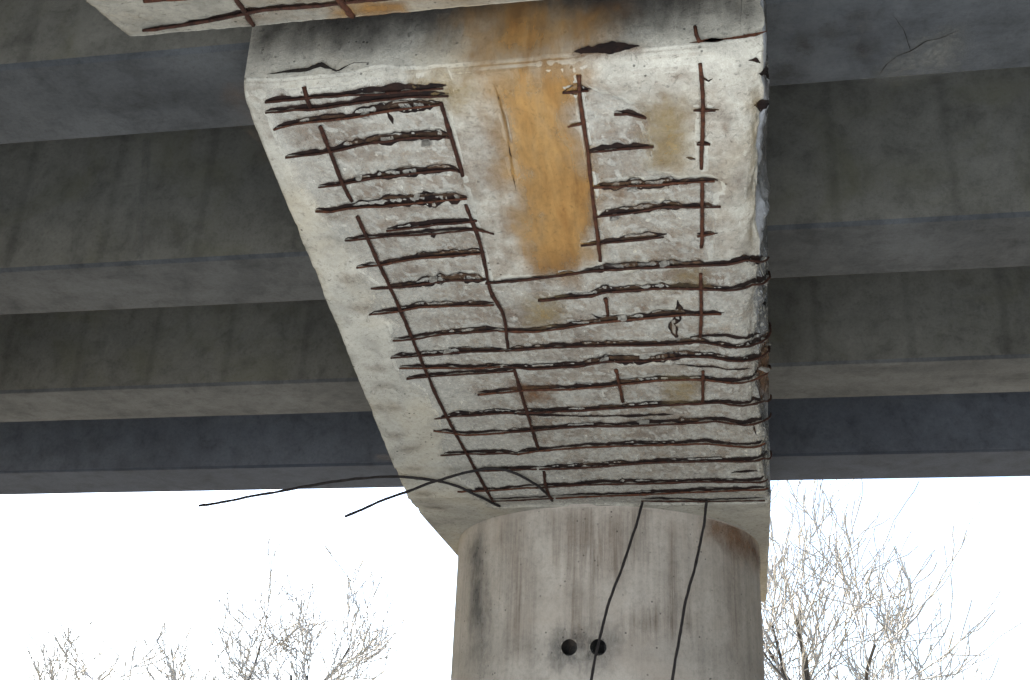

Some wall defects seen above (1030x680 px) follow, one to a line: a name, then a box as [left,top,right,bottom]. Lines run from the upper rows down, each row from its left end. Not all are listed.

spalling [142,0,388,32]
rust [470,6,597,275]
spalling [574,41,640,54]
spalling [198,55,772,680]